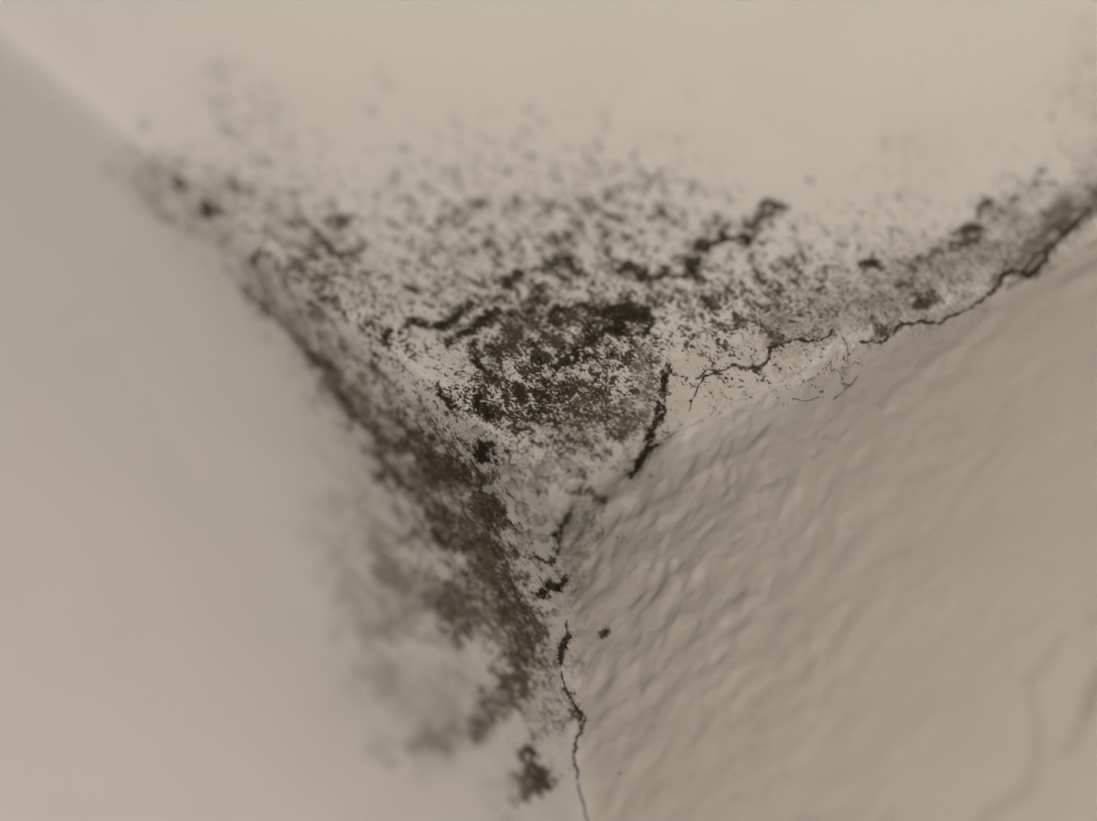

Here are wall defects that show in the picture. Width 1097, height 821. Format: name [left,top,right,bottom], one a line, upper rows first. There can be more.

water stain [131,106,1097,806]
crack [624,200,1097,478]
crack [560,620,588,821]